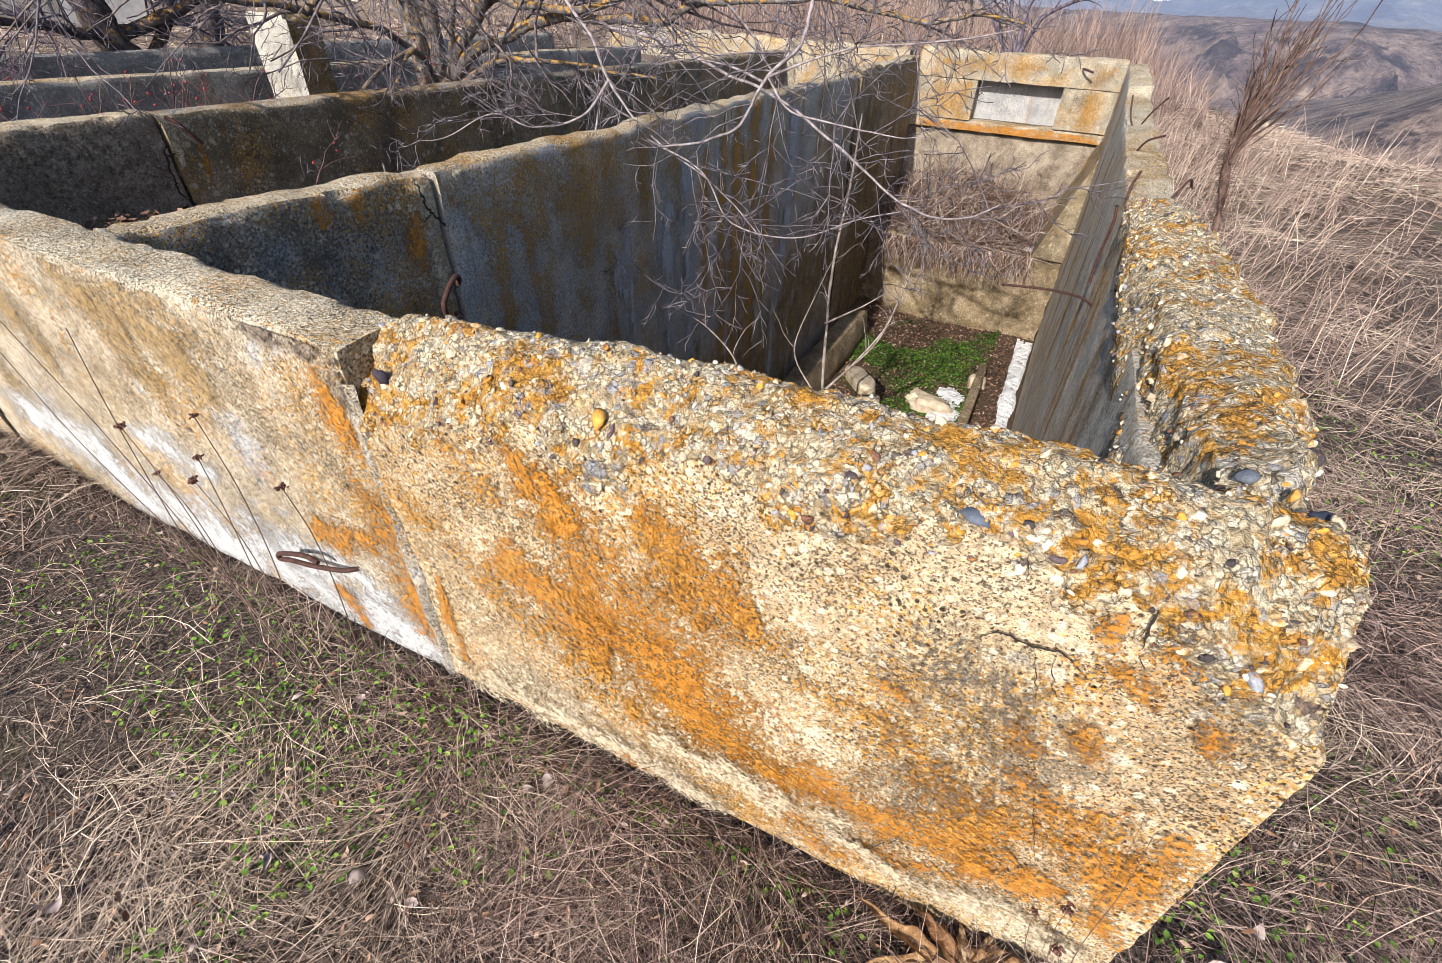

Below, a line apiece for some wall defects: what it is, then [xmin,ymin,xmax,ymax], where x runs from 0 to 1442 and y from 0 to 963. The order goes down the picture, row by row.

rust [0,279,71,389]
rust [27,256,227,417]
crack [160,124,193,203]
rust [447,130,682,342]
rust [701,99,775,369]
spalling [230,167,1373,752]
rust [305,349,1263,952]
crack [975,631,1088,702]